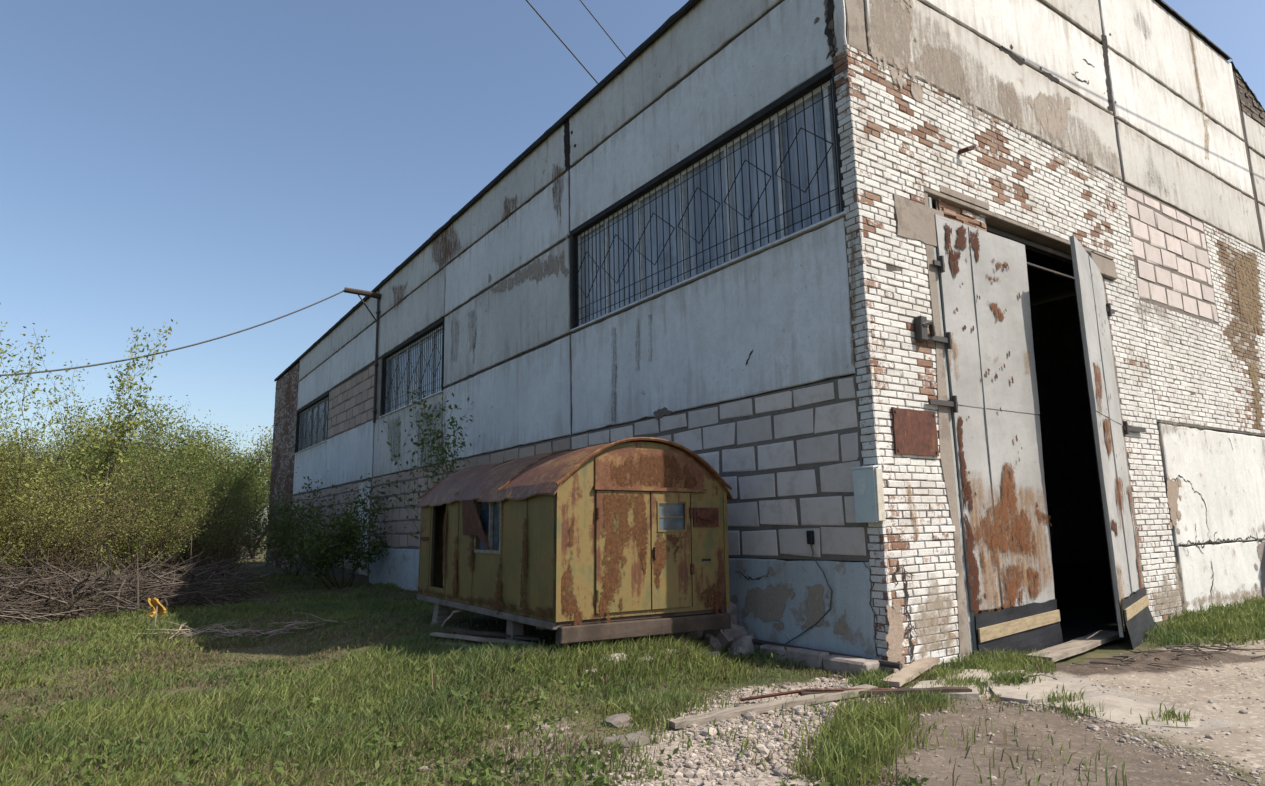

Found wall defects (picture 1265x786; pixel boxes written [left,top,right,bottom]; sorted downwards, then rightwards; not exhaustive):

peeling [854,0,1071,211]
flaking render [853,191,883,238]
flaking render [1046,159,1113,251]
flaking render [1215,241,1265,430]
corrosion [418,510,583,626]
corrosion [599,455,698,623]
crack [735,570,769,581]
peeling [730,567,847,635]
crack [862,561,917,662]
corrosion [958,416,1052,615]
corrosion [1094,363,1143,589]
crack [1172,475,1265,595]